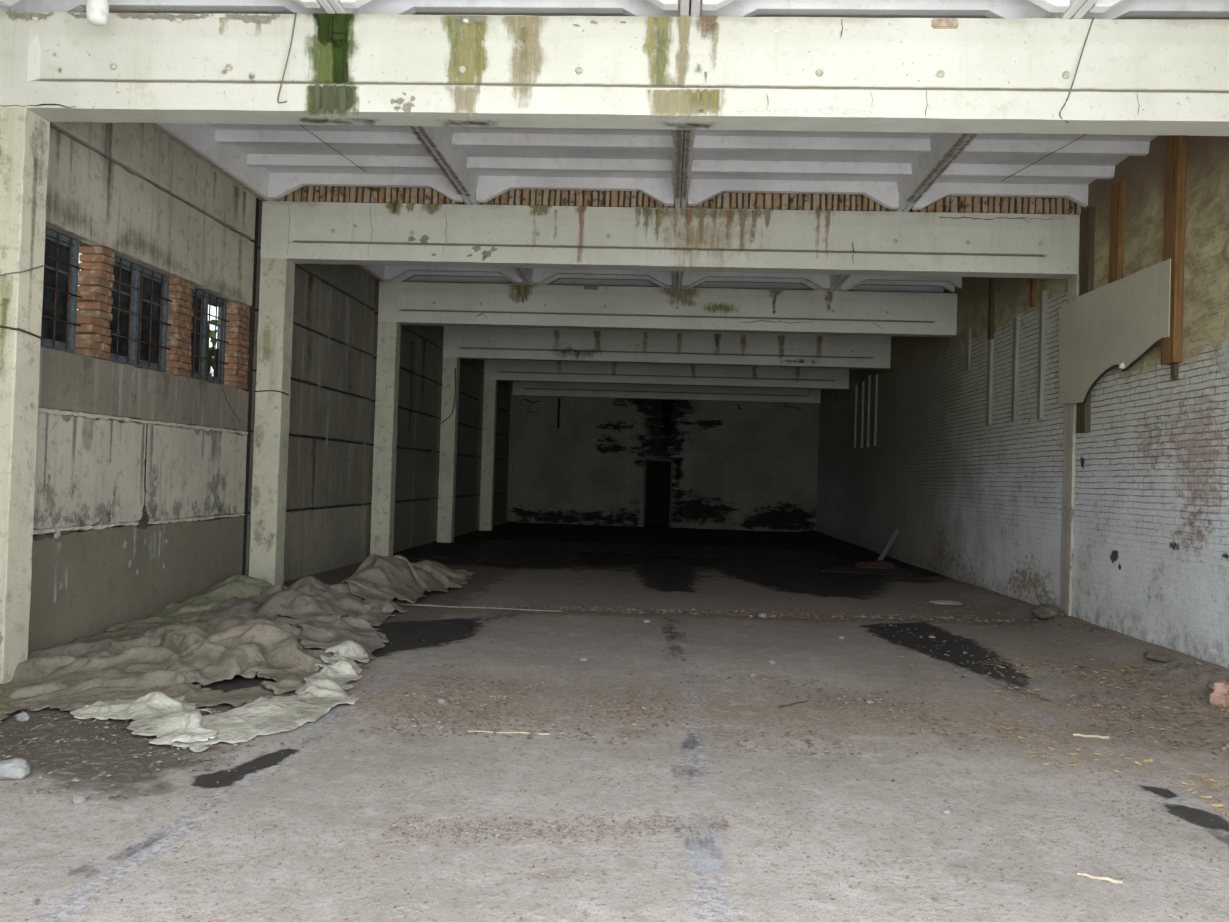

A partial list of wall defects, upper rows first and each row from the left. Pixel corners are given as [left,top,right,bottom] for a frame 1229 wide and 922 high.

water stain [308,13,355,83]
water stain [444,15,488,126]
water stain [504,16,541,94]
water stain [643,15,719,128]
corrosion [636,130,770,256]
water stain [666,457,816,531]